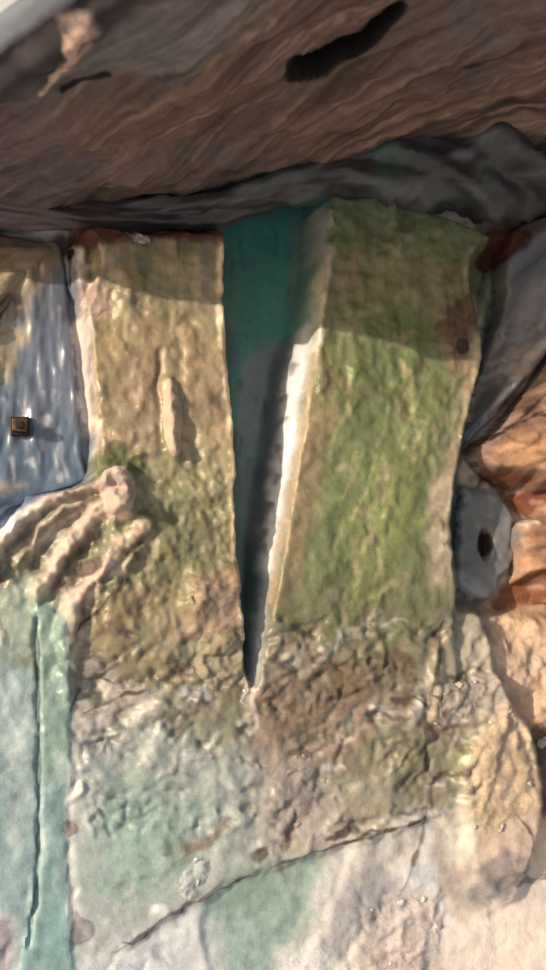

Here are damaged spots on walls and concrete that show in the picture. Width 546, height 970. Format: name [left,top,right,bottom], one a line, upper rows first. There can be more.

corrosion [476,227,531,278]
crack [417,623,443,768]
crack [280,819,425,867]
crack [125,875,251,945]